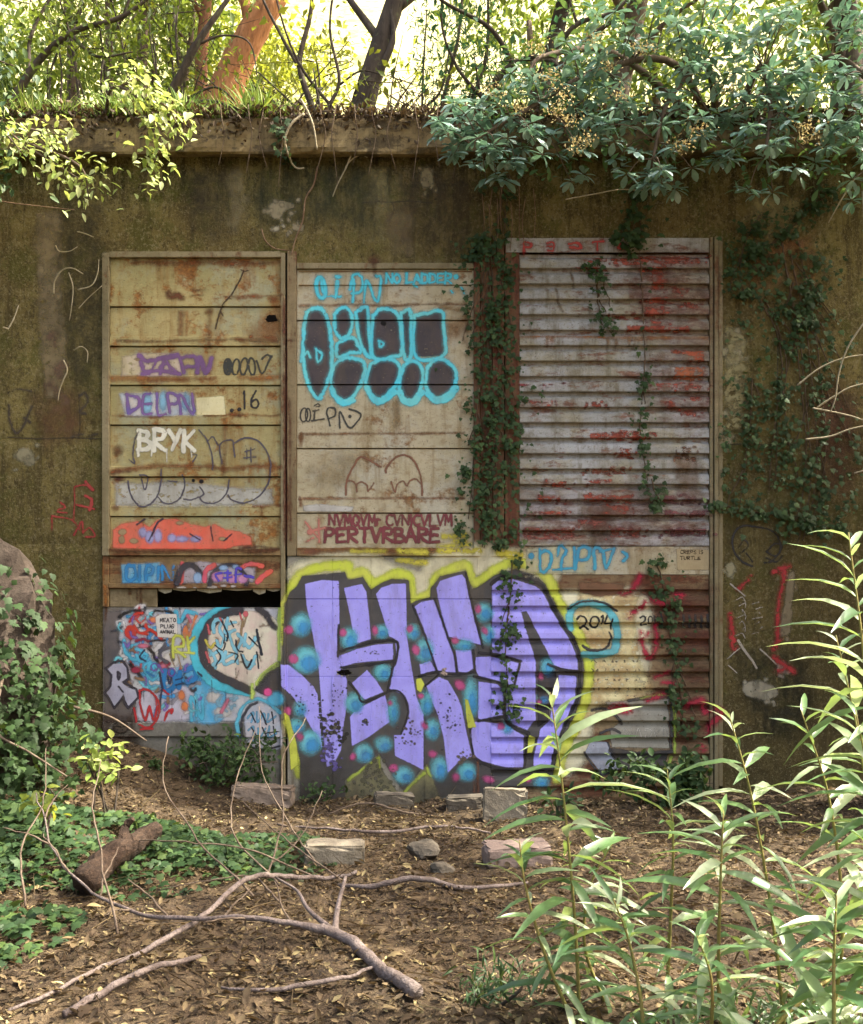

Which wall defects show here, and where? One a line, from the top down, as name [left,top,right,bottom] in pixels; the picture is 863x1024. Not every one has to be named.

spalling [158,270,288,607]
spalling [263,198,304,236]
rust [110,290,469,554]
peeling [504,271,717,548]
peeling [519,253,712,357]